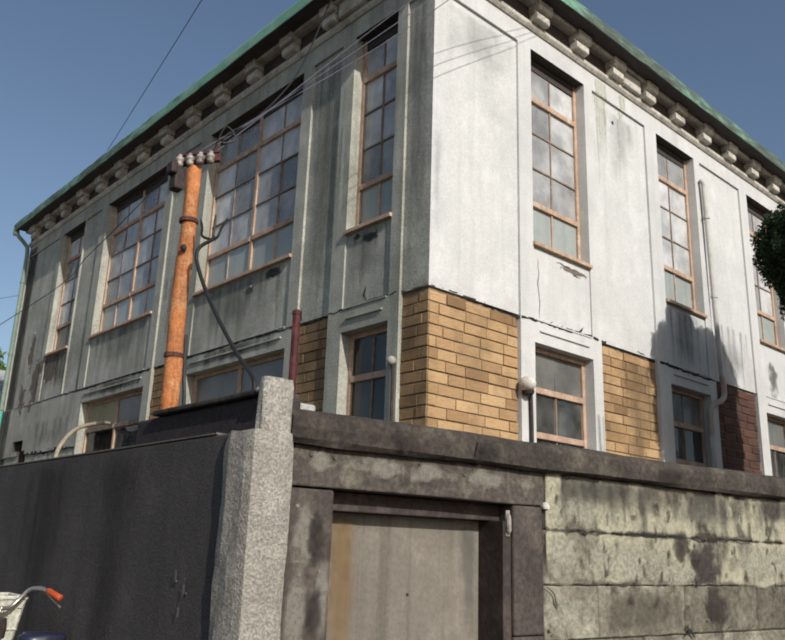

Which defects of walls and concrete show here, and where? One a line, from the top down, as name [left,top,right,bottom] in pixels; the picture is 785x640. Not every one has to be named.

crack [187,270,757,394]
peeling [16,333,58,416]
crack [12,366,164,410]
leakage [309,515,323,557]
leakage [545,473,785,633]
leakage [307,592,320,628]